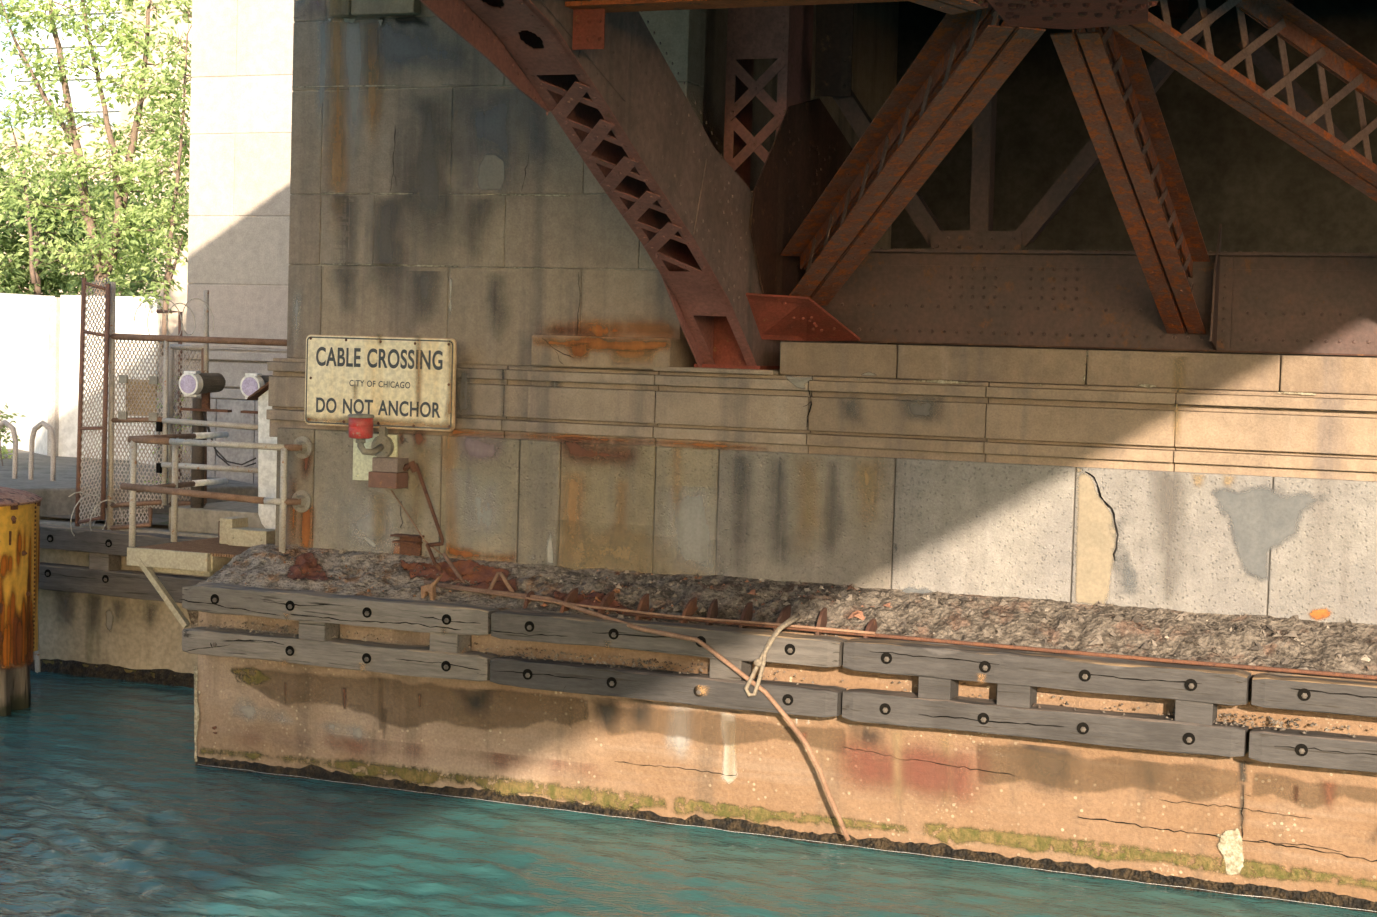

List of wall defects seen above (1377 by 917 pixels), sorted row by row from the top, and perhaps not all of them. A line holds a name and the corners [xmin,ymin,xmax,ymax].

rust [540,322,673,361]
rust [526,434,633,462]
rust [0,520,39,667]
rust [392,544,517,592]
spalling [205,468,1377,683]
damp [1214,487,1316,579]